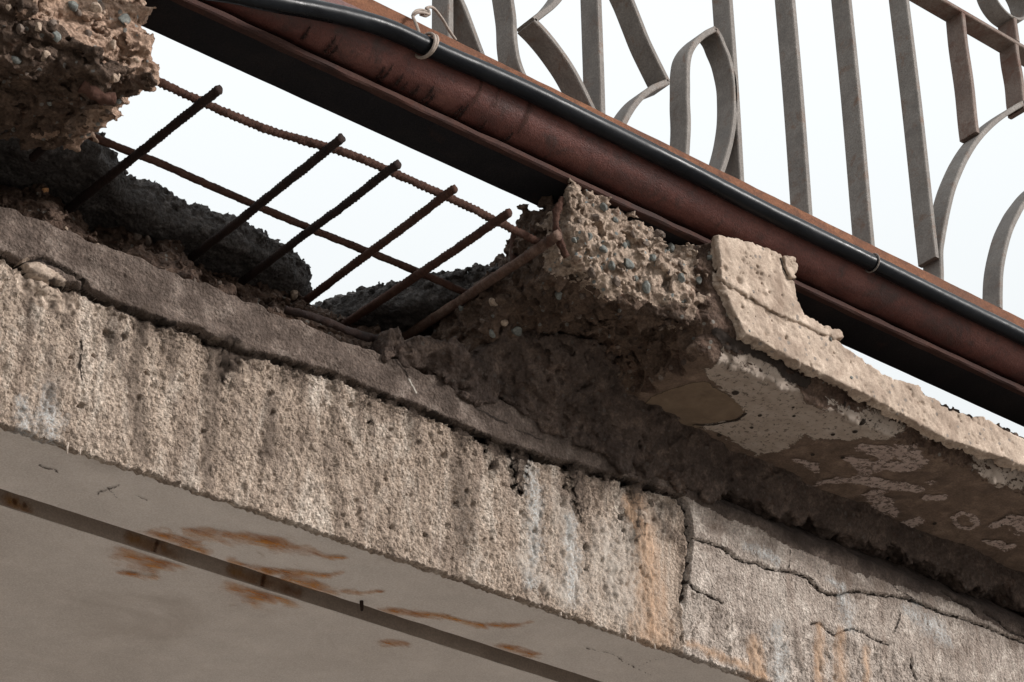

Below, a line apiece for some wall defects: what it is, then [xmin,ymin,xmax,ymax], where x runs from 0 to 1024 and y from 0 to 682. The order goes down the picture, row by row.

spalling [0,0,158,151]
spalling [0,178,1024,615]
crack [0,252,1024,646]
rust [123,530,298,579]
rust [230,562,331,605]
rust [387,609,515,627]